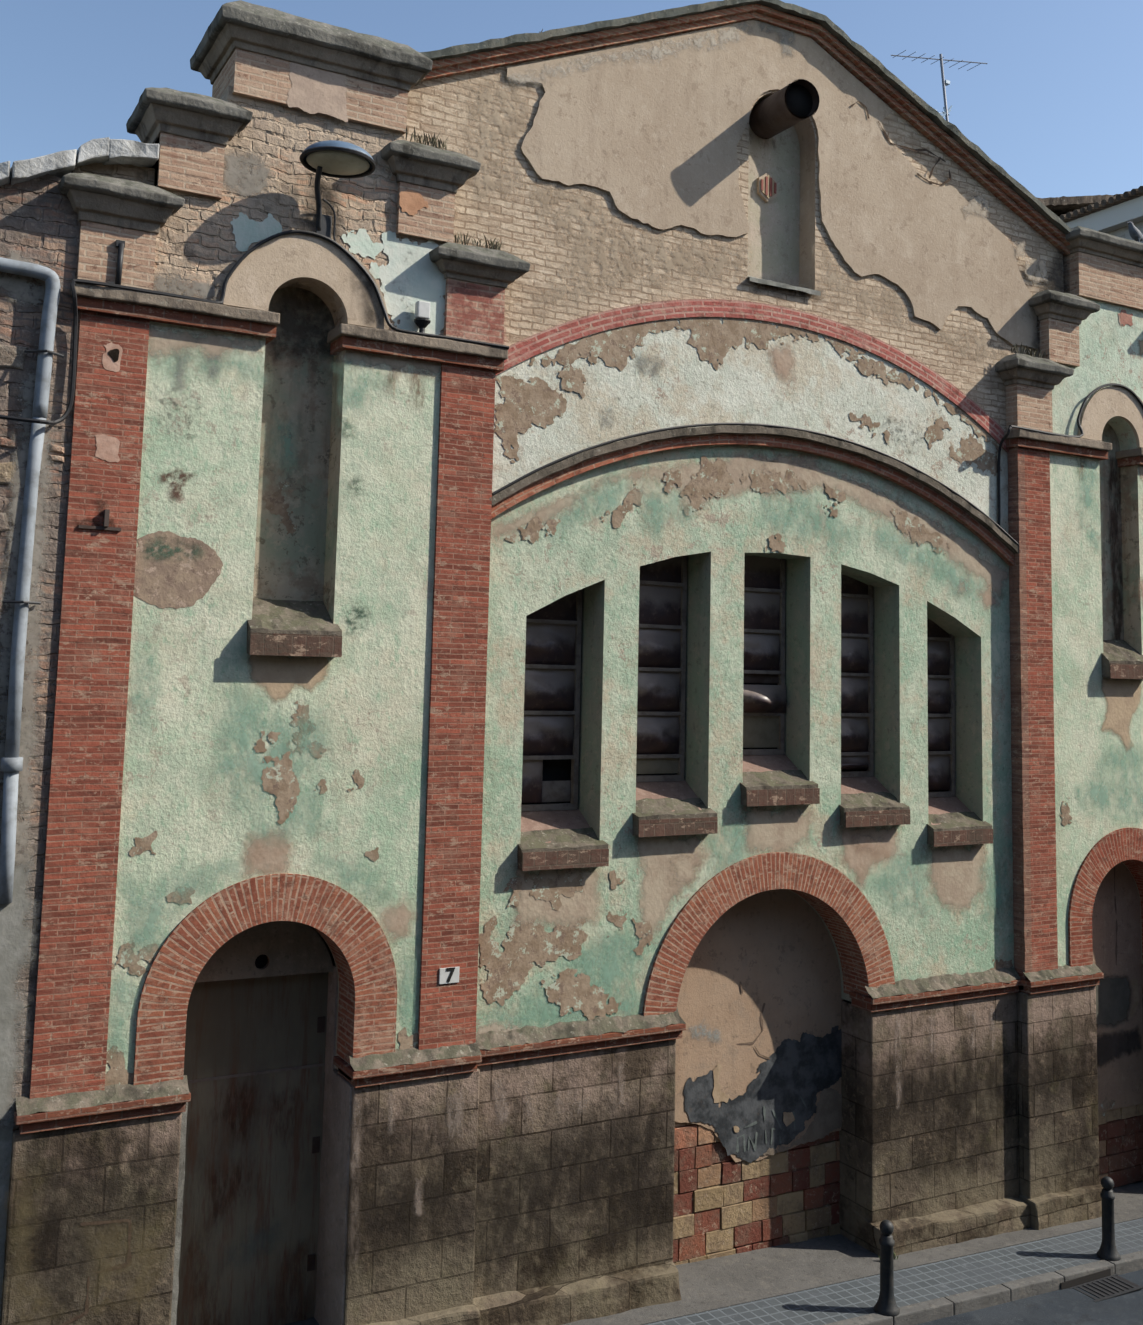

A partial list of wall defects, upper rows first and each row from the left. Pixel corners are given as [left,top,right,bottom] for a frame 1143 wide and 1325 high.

peeling [1016,242,1047,282]
peeling [134,531,223,609]
flaking render [493,317,1032,971]
peeling [1102,678,1141,751]
peeling [245,655,328,875]
peeling [347,769,365,792]
peeling [478,835,703,1020]
flaking render [763,1088,842,1156]